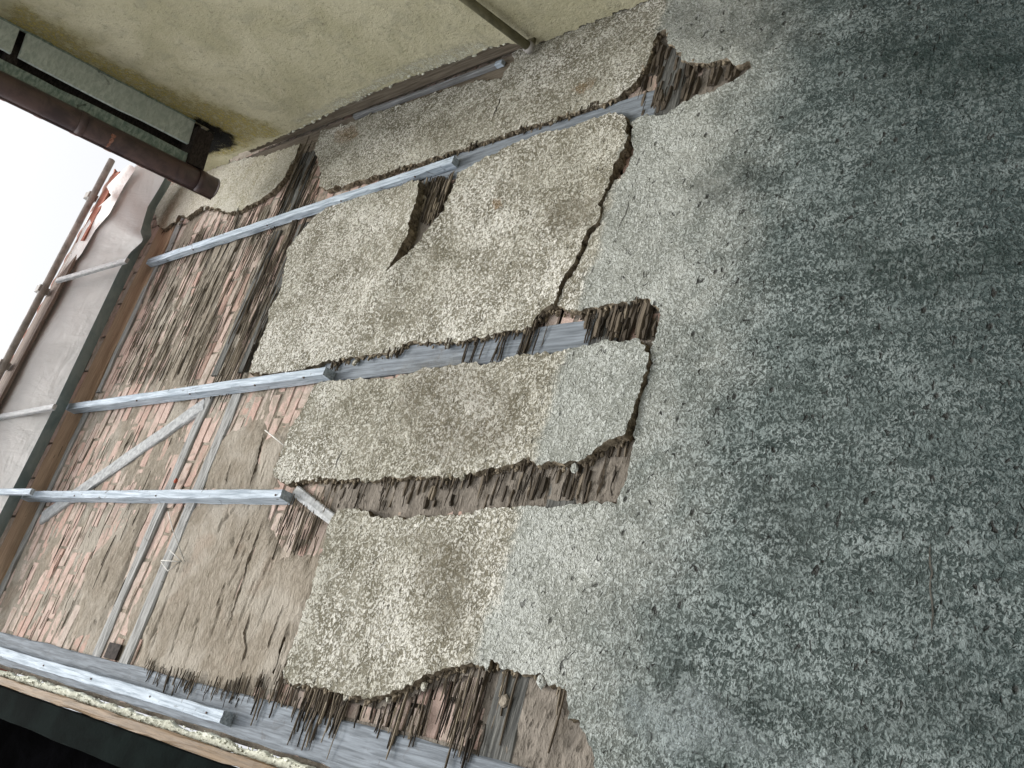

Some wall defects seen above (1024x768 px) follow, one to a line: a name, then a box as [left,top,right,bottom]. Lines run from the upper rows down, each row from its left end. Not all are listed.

water stain [8,7,277,154]
spalling [632,32,750,116]
spalling [0,100,660,768]